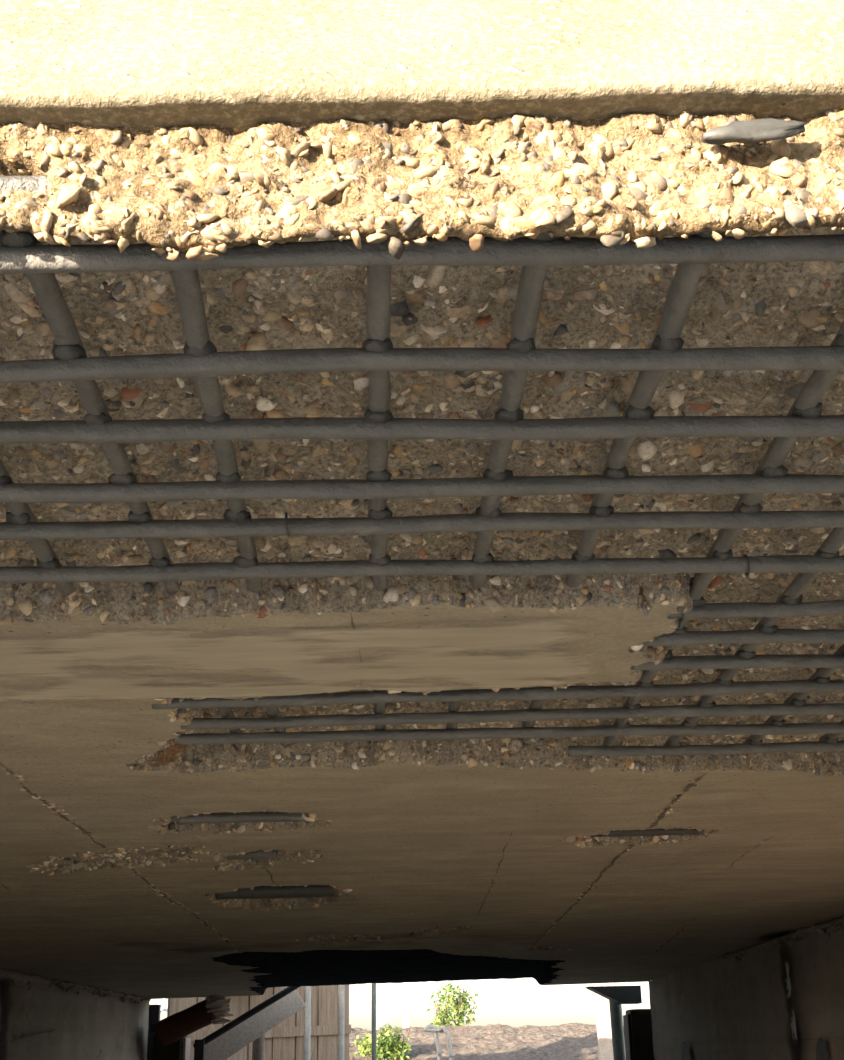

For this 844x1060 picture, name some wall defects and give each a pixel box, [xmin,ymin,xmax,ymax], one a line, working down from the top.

spalling [0,108,844,361]
spalling [0,381,87,421]
spalling [217,371,369,419]
spalling [389,371,505,419]
spalling [520,371,640,419]
spalling [649,370,814,416]
spalling [625,437,774,476]
spalling [245,499,368,518]
spalling [0,572,844,777]
crack [0,762,108,851]
crack [527,772,708,951]
spalling [211,949,566,995]